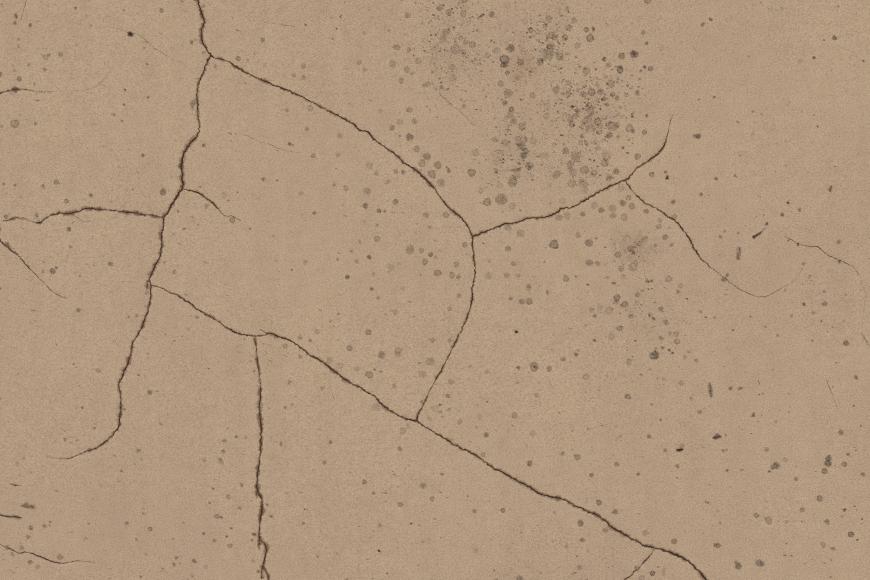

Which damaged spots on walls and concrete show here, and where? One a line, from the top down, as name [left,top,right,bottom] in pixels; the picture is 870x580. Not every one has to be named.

crack [0,239,60,296]
crack [34,0,714,580]
crack [0,544,73,564]